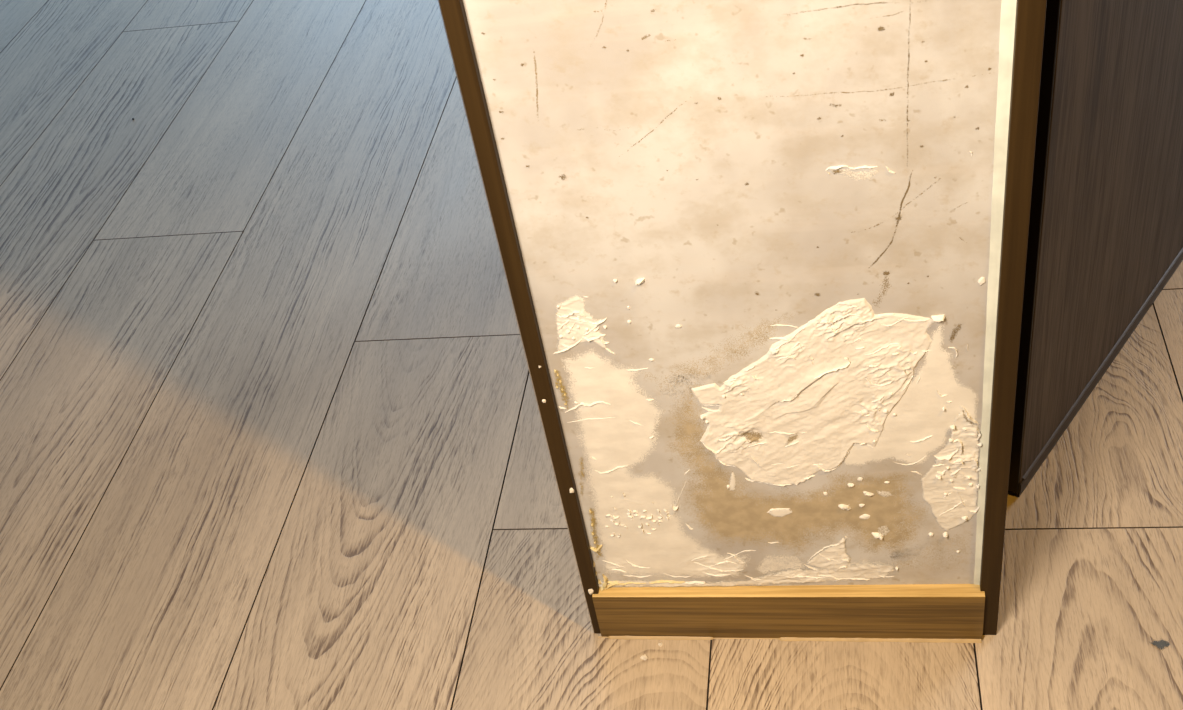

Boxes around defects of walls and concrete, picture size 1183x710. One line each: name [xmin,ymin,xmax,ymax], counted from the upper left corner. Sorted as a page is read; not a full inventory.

crack [789,0,913,268]
peeling [825,165,895,181]
peeling [553,295,616,355]
spalling [735,431,763,450]
damp [644,314,973,572]